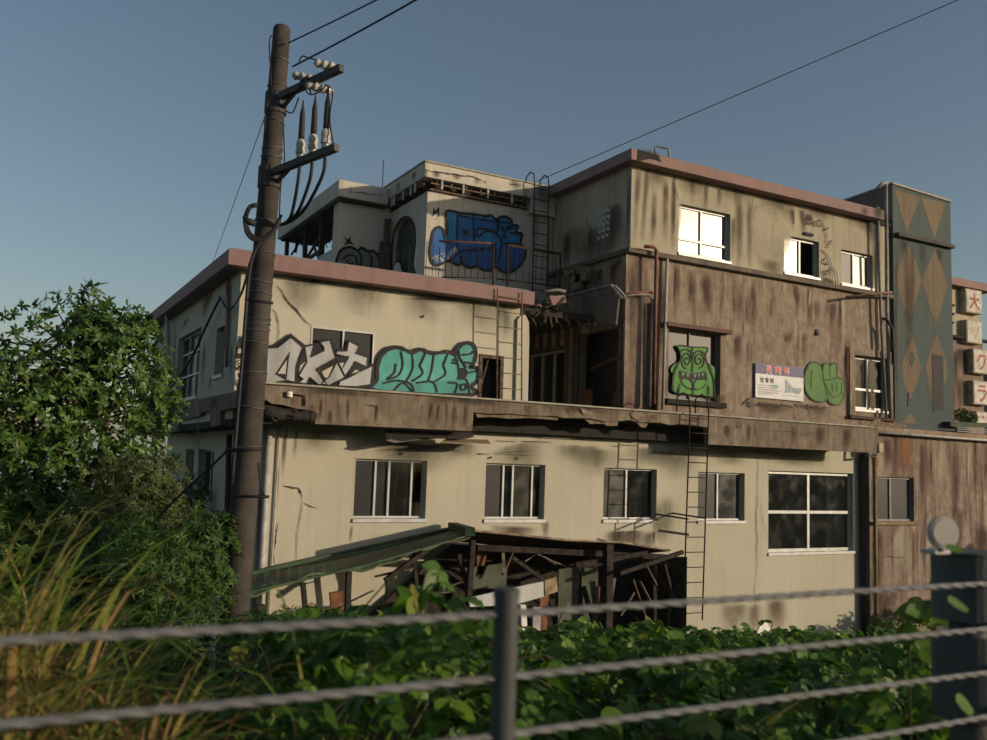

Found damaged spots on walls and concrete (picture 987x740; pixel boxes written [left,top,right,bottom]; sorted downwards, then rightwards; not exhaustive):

water stain [583,178,648,254]
crack [272,287,311,342]
crack [273,485,316,563]